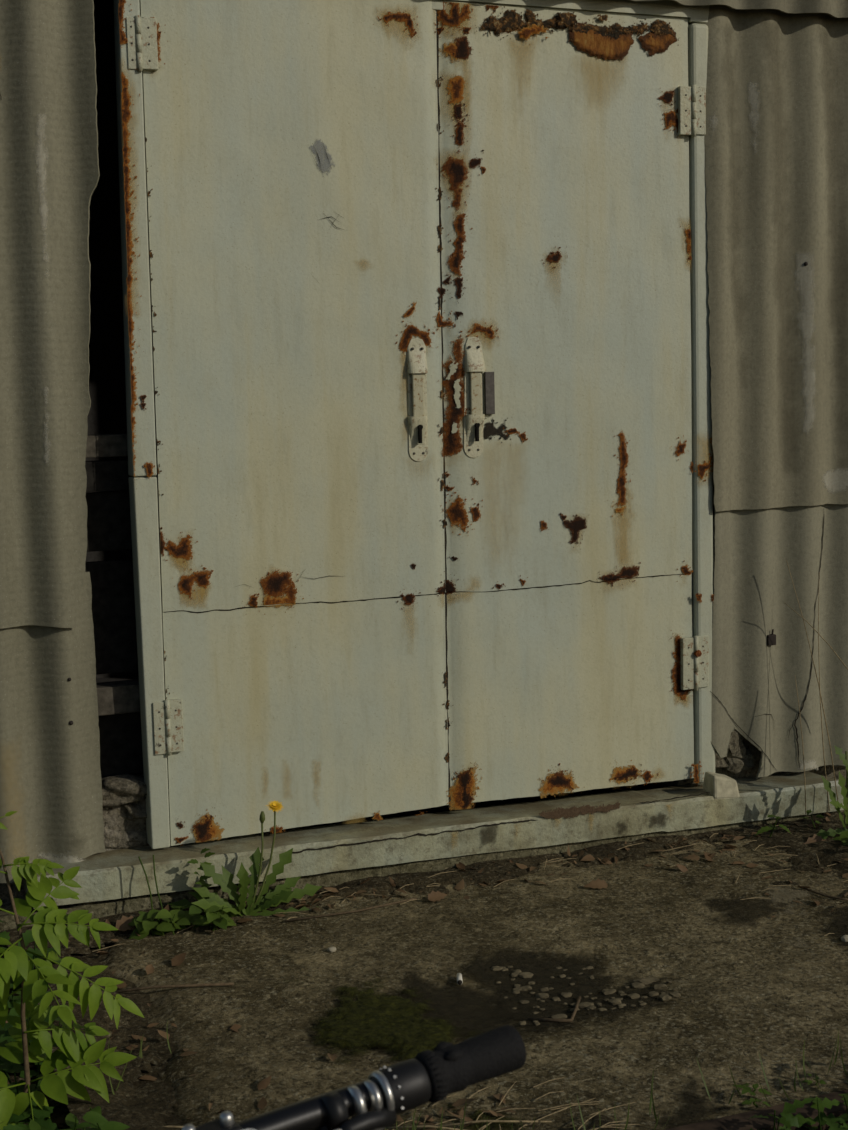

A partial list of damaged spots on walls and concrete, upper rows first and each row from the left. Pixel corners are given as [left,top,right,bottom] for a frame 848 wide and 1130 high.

rust [396,0,499,457]
rust [121,65,156,479]
rust [442,472,483,535]
rust [598,431,641,587]
rust [160,527,214,602]
rust [242,569,304,615]
rust [669,630,693,701]
crack [710,515,825,768]
rust [446,762,482,810]
rust [538,763,585,798]
rust [175,809,225,844]
leakage [385,972,546,1039]